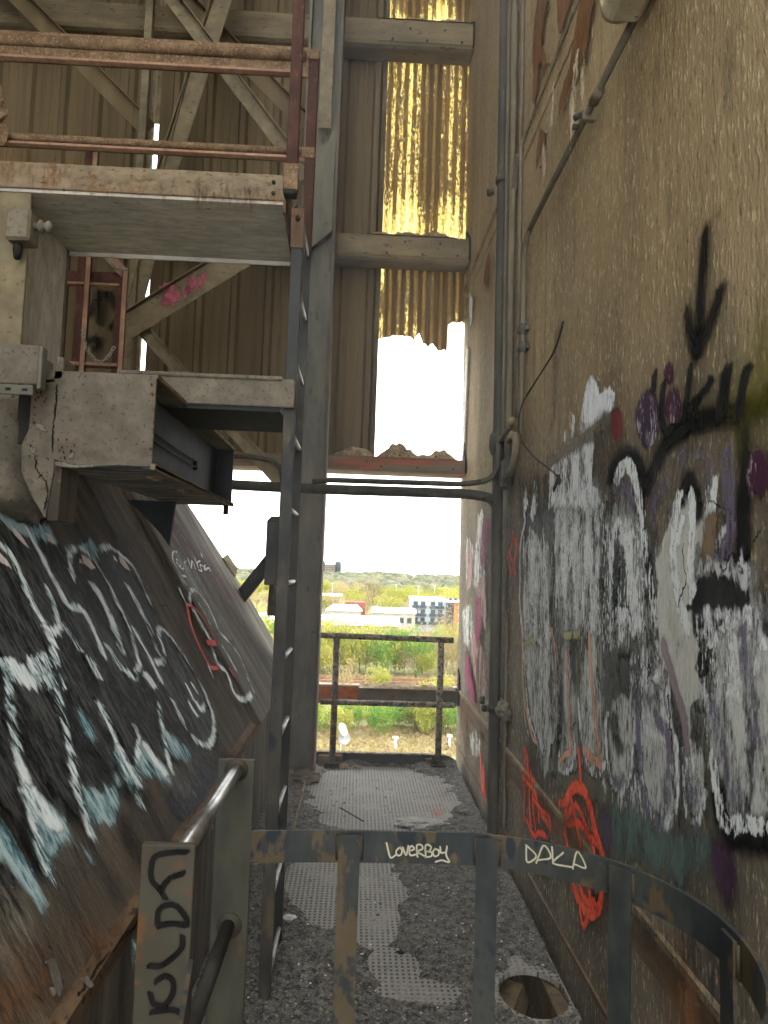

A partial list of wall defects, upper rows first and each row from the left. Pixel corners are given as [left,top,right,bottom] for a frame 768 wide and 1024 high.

peeling [532,0,595,114]
crack [30,385,58,510]